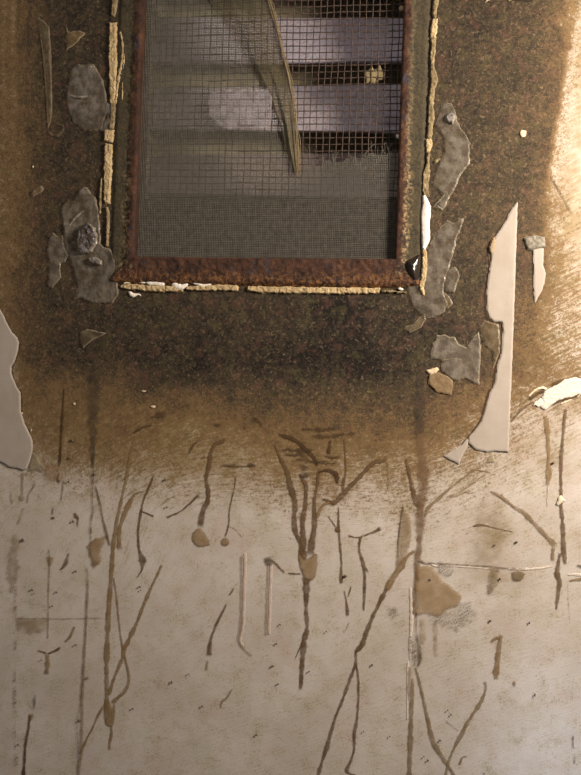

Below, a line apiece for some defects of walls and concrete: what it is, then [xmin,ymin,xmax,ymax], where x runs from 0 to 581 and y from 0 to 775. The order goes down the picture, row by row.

peeling [0,310,46,472]
peeling [444,201,581,464]
leakage [413,566,461,617]